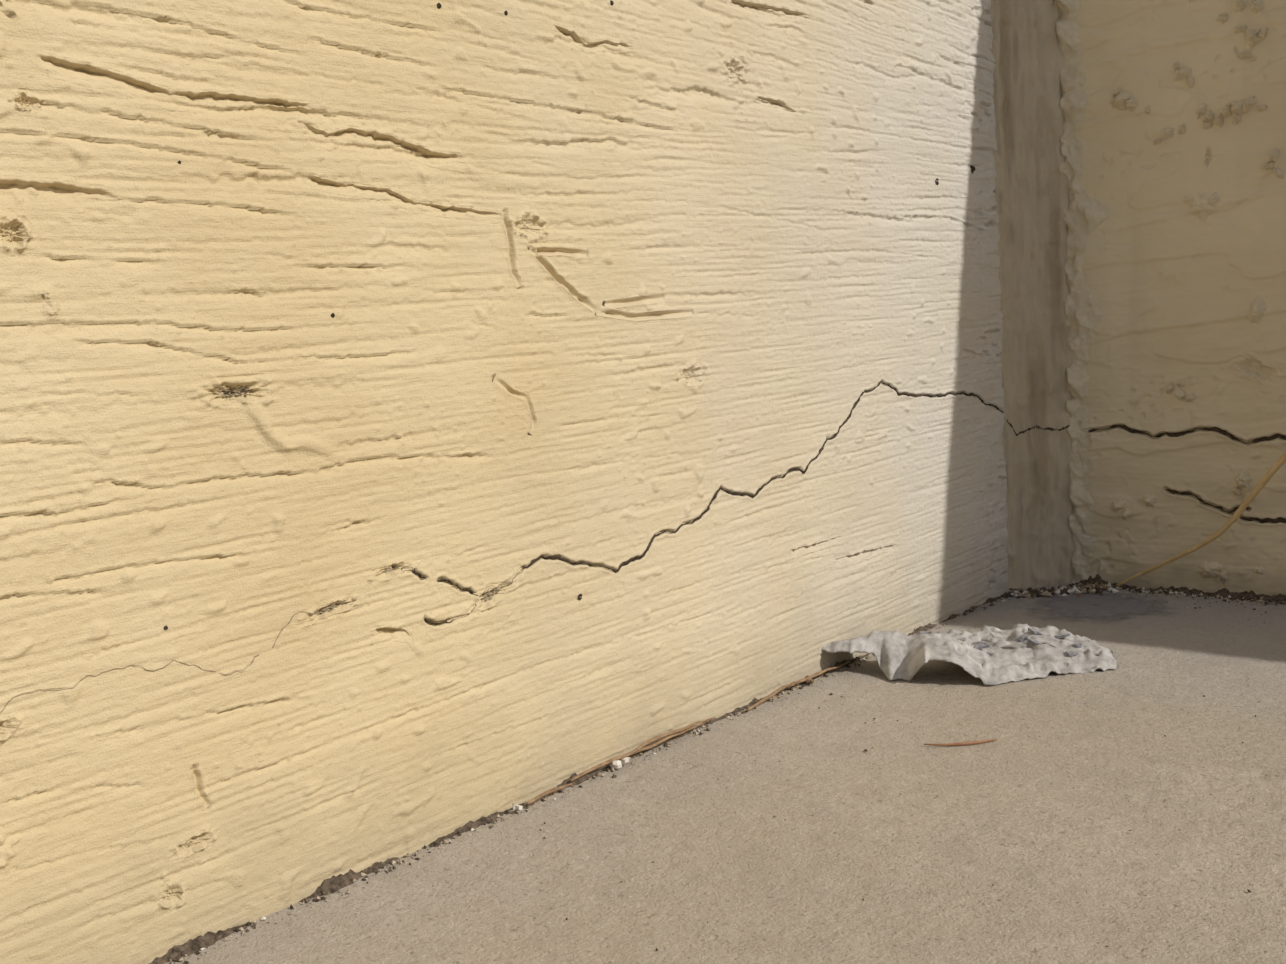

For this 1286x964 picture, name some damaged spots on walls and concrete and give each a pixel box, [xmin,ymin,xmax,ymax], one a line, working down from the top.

spalling [0,176,124,256]
spalling [179,370,289,413]
crack [401,382,1286,624]
crack [3,601,354,709]